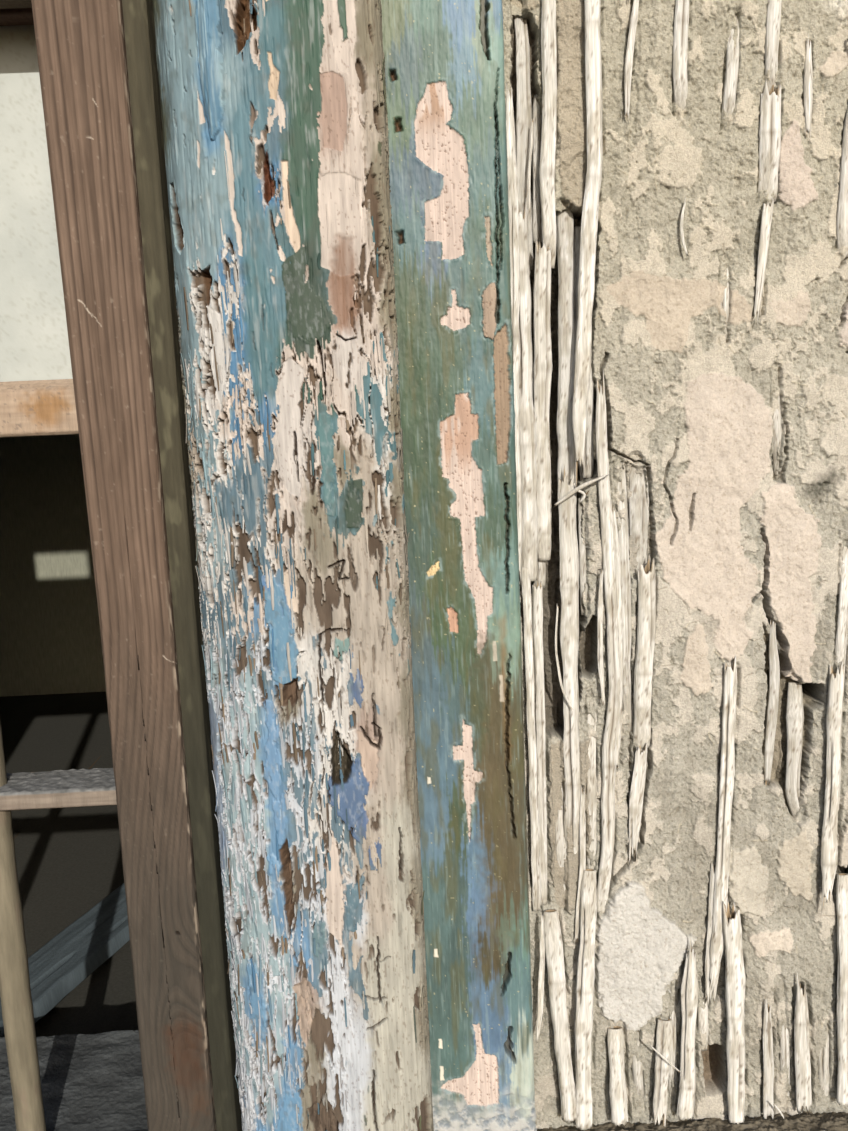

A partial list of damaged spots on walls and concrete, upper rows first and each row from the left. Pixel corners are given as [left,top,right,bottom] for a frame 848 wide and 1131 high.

peeling [375,59,470,260]
spalling [510,0,542,148]
peeling [152,0,411,1131]
peeling [440,392,494,655]
spalling [519,0,592,915]
crack [599,352,697,567]
flaking render [624,373,825,916]
crack [752,527,791,690]
crack [771,401,790,484]
peeling [441,1023,500,1107]
crack [500,952,513,997]
crack [504,1026,517,1066]